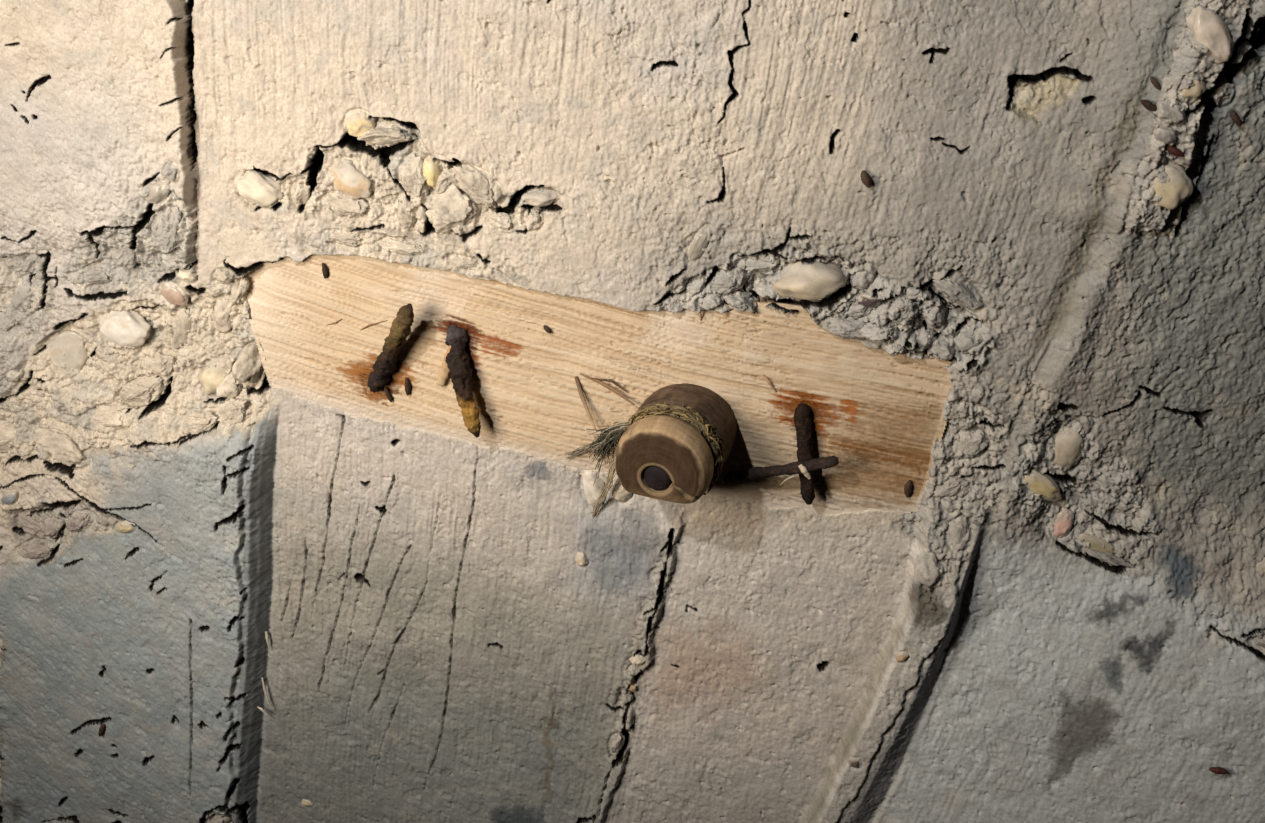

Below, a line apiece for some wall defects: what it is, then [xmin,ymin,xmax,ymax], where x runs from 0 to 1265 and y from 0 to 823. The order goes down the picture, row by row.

crack [80,172,160,258]
crack [159,0,198,171]
spalling [235,117,560,287]
crack [718,0,751,123]
spalling [1119,0,1265,238]
spalling [0,161,271,476]
crack [0,230,292,403]
corrosion [339,354,414,400]
corrosion [433,316,521,372]
spalling [654,244,1000,375]
corrosion [768,389,933,504]
spalling [890,391,1164,614]